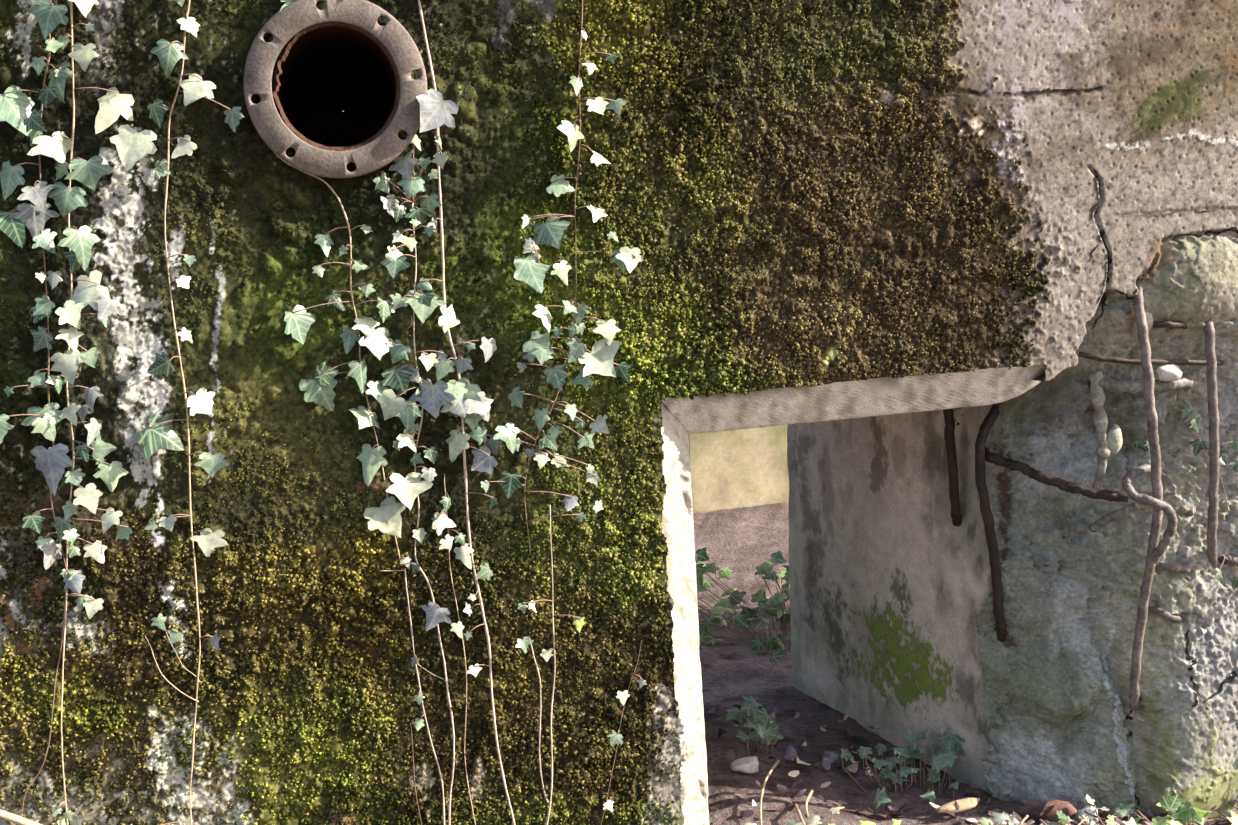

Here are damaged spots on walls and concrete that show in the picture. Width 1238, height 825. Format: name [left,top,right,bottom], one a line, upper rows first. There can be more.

corrosion [272,22,400,151]
crack [691,75,1104,120]
water stain [1163,129,1238,147]
corrosion [1145,234,1175,282]
crack [1088,165,1238,335]
water stain [92,148,185,547]
water stain [160,580,191,657]
water stain [891,572,910,619]
corrosion [995,445,1012,565]
spalling [973,257,1238,818]